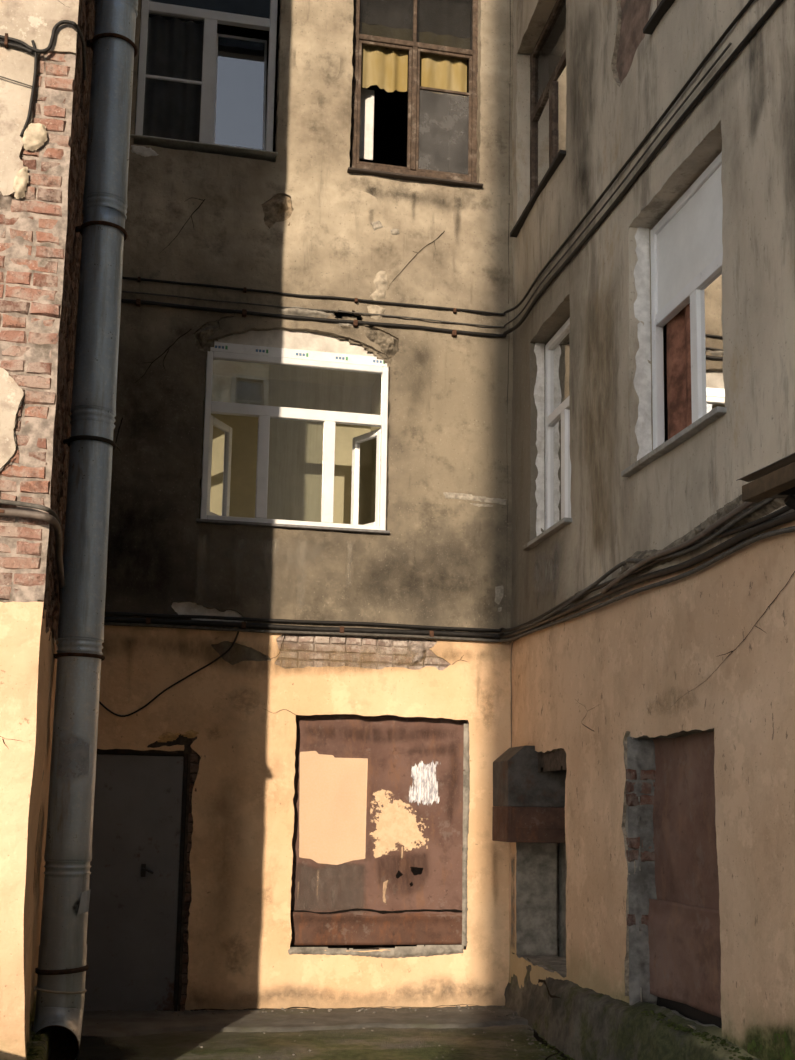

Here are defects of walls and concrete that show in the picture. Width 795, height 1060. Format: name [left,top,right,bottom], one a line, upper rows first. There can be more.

spalling [0,52,77,603]
spalling [262,194,293,229]
crack [388,231,445,289]
spalling [211,634,450,670]
crack [671,571,795,707]
spalling [134,734,201,1012]
spalling [625,734,657,1005]